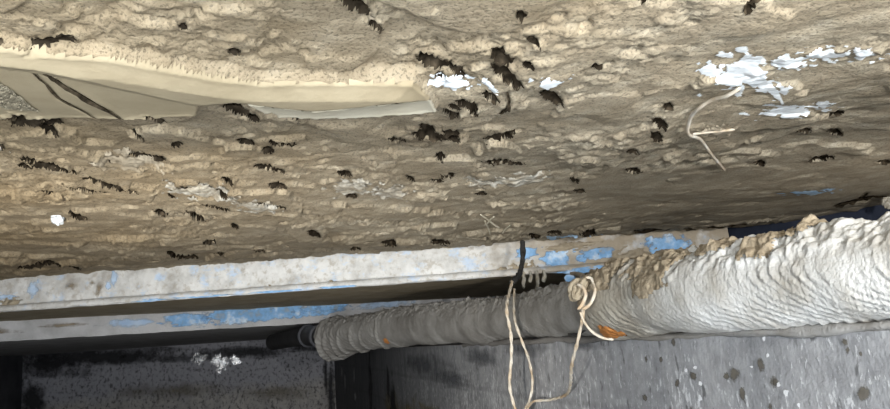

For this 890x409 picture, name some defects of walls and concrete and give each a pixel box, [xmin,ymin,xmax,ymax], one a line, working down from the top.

crack [743,0,761,16]
peeling [508,228,692,282]
peeling [110,300,416,328]